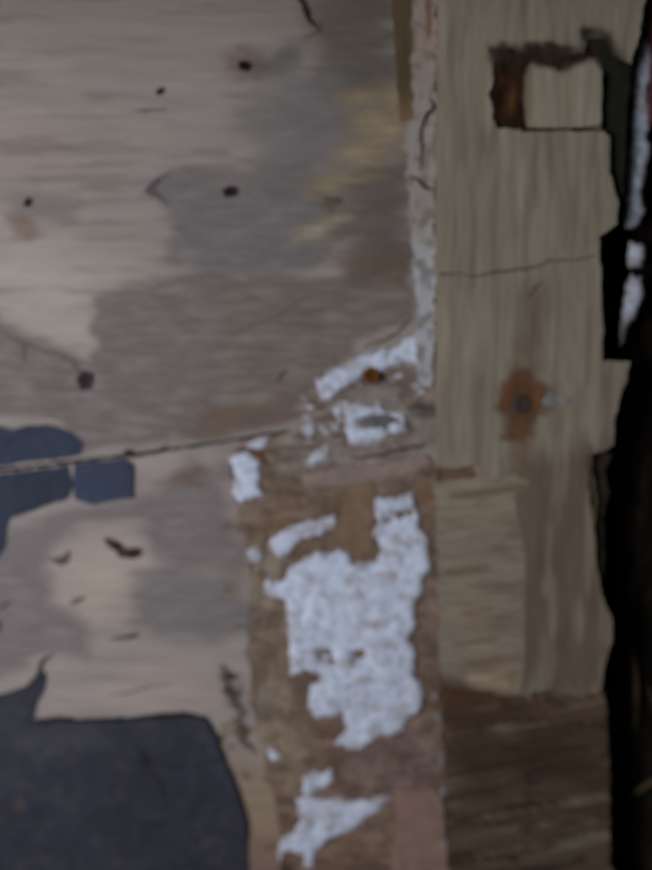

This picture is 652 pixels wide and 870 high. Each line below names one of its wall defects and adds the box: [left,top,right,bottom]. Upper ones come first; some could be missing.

crack [298,0,322,37]
crack [439,255,596,298]
rust [362,367,380,383]
peeling [300,395,351,442]
rust [497,370,547,441]
crack [0,431,289,472]
peeling [0,425,134,553]
peeling [270,454,431,560]
peeling [104,537,142,559]
peeling [0,667,249,870]
peeling [302,768,335,795]
peeling [390,788,448,870]